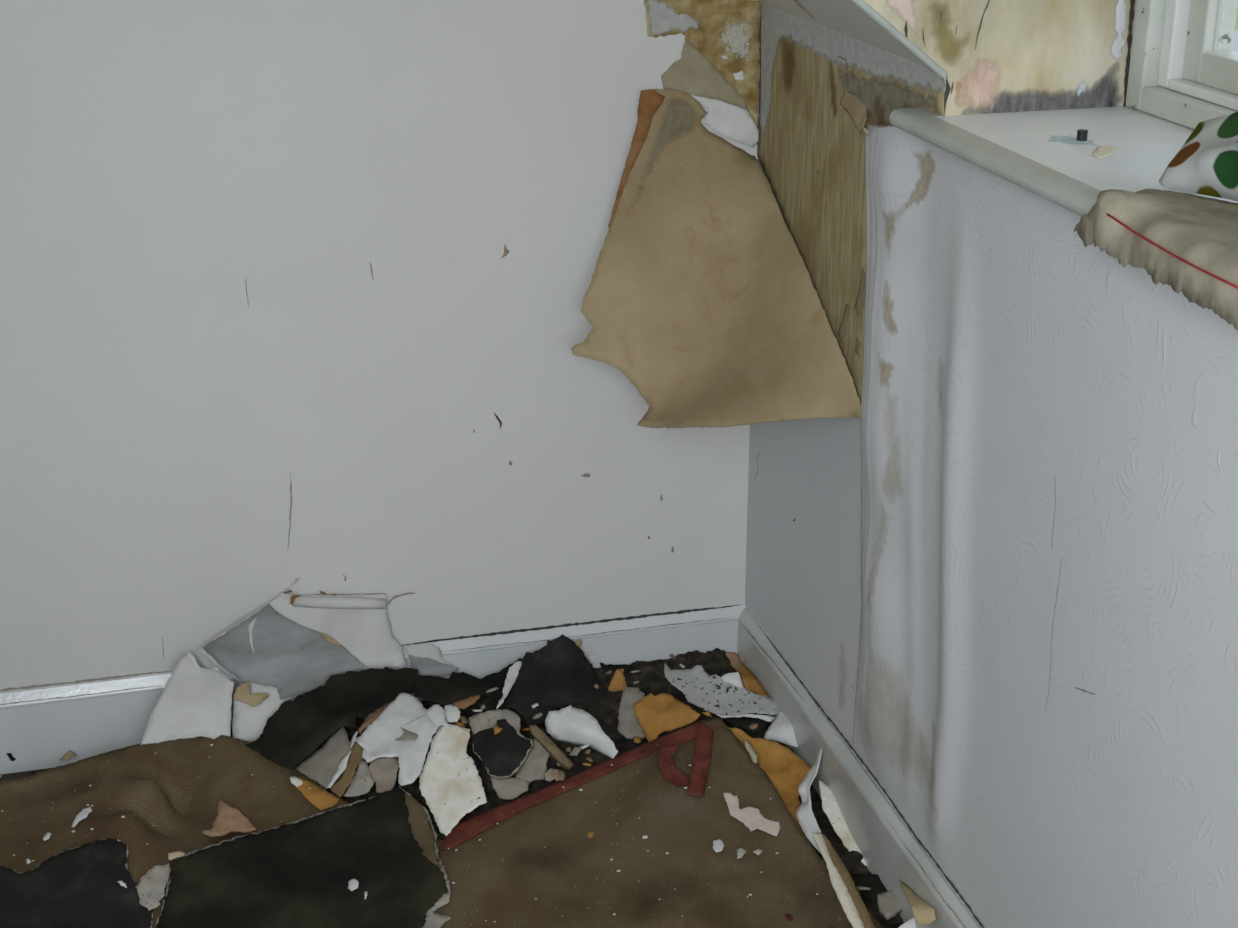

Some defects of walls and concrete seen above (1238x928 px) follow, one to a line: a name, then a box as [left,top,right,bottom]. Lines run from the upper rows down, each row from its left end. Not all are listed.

peeling [1111,0,1127,59]
peeling [644,0,997,402]
water stain [907,155,933,205]